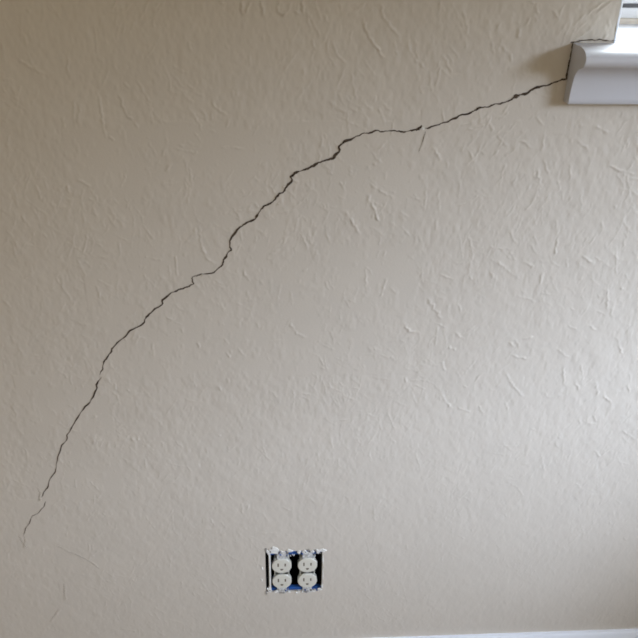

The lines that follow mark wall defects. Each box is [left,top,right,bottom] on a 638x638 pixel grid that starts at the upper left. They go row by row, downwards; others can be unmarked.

crack [19,39,616,546]